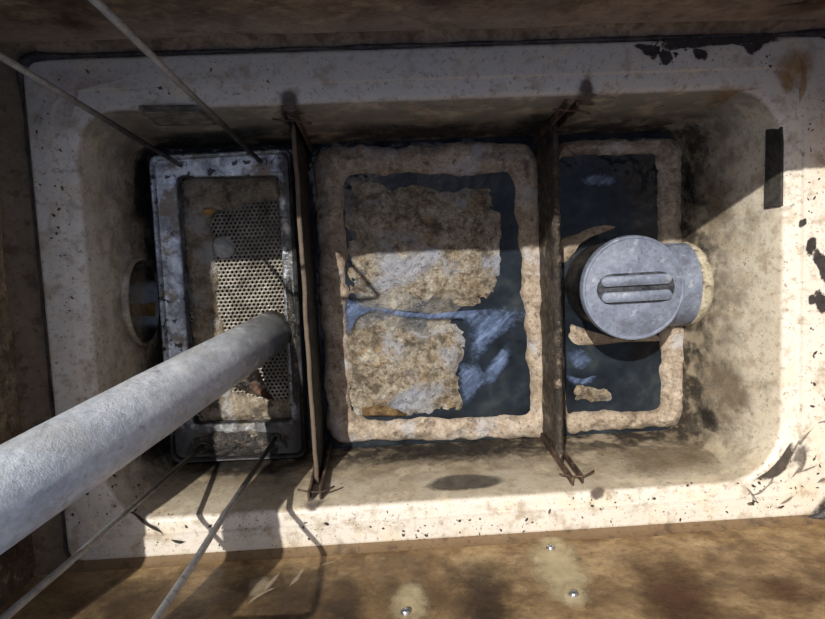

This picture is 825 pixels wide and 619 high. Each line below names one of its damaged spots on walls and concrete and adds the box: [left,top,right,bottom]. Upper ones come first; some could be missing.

rust [281,91,303,118]
leakage [696,402,718,430]
leakage [431,475,499,490]
leakage [533,537,588,606]
leakage [249,577,357,619]
leakage [392,585,426,619]